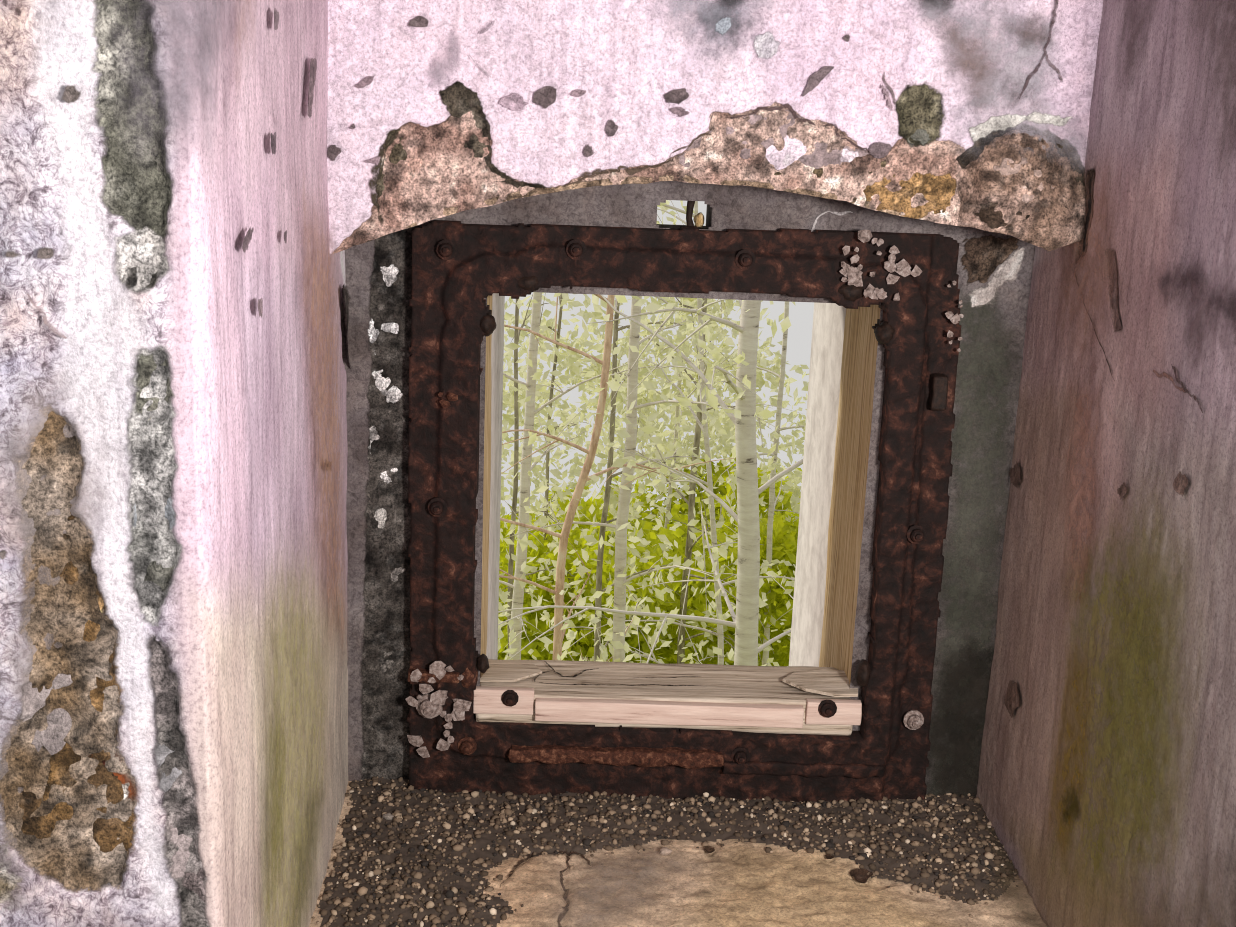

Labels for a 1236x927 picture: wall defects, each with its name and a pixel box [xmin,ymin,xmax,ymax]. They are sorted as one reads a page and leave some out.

peeling [802,66,834,96]
spalling [1075,169,1095,263]
spalling [332,72,1024,780]
spalling [0,406,137,903]
crack [500,851,591,927]